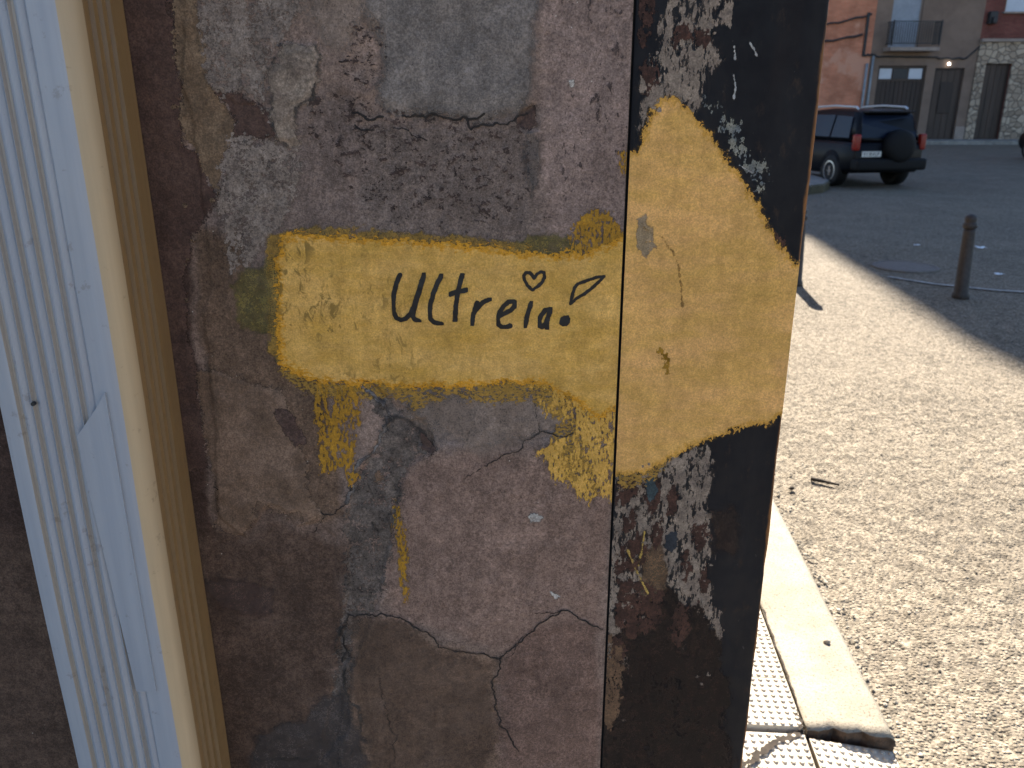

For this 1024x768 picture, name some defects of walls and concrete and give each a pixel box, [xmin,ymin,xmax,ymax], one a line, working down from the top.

crack [351,111,528,141]
peeling [581,0,770,193]
crack [466,404,573,477]
peeling [528,383,725,692]
crack [340,610,603,752]